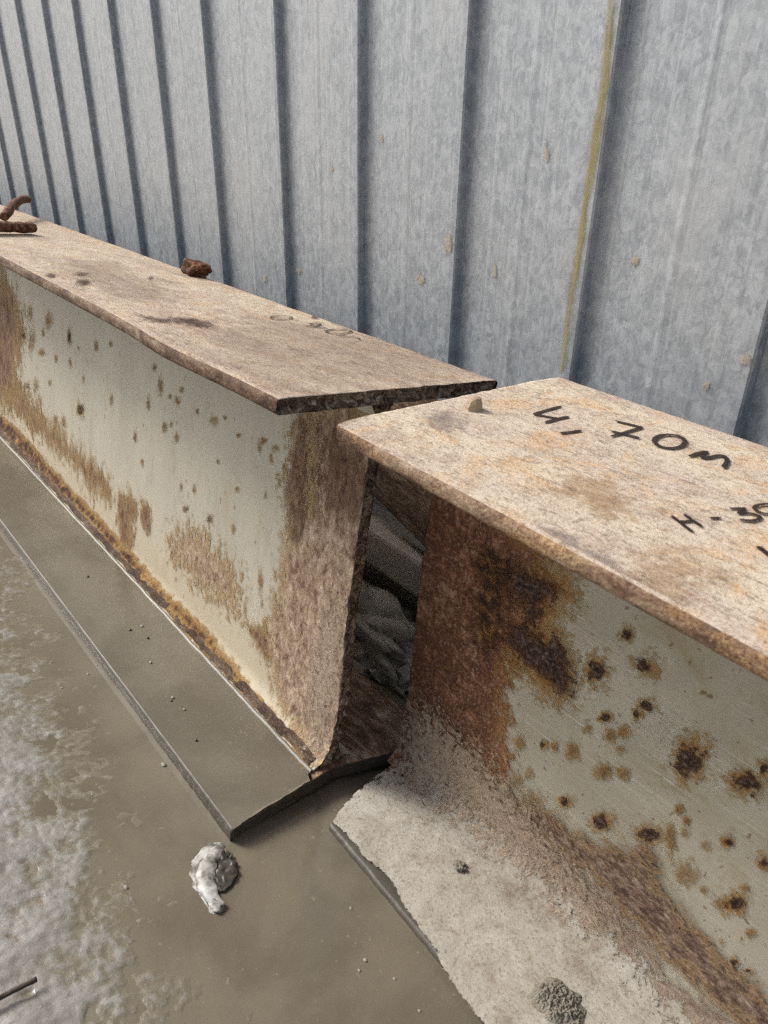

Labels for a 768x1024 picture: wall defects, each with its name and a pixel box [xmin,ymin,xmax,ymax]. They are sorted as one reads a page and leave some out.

damp [560,0,614,370]
rust [0,265,377,768]
rust [386,493,768,1024]